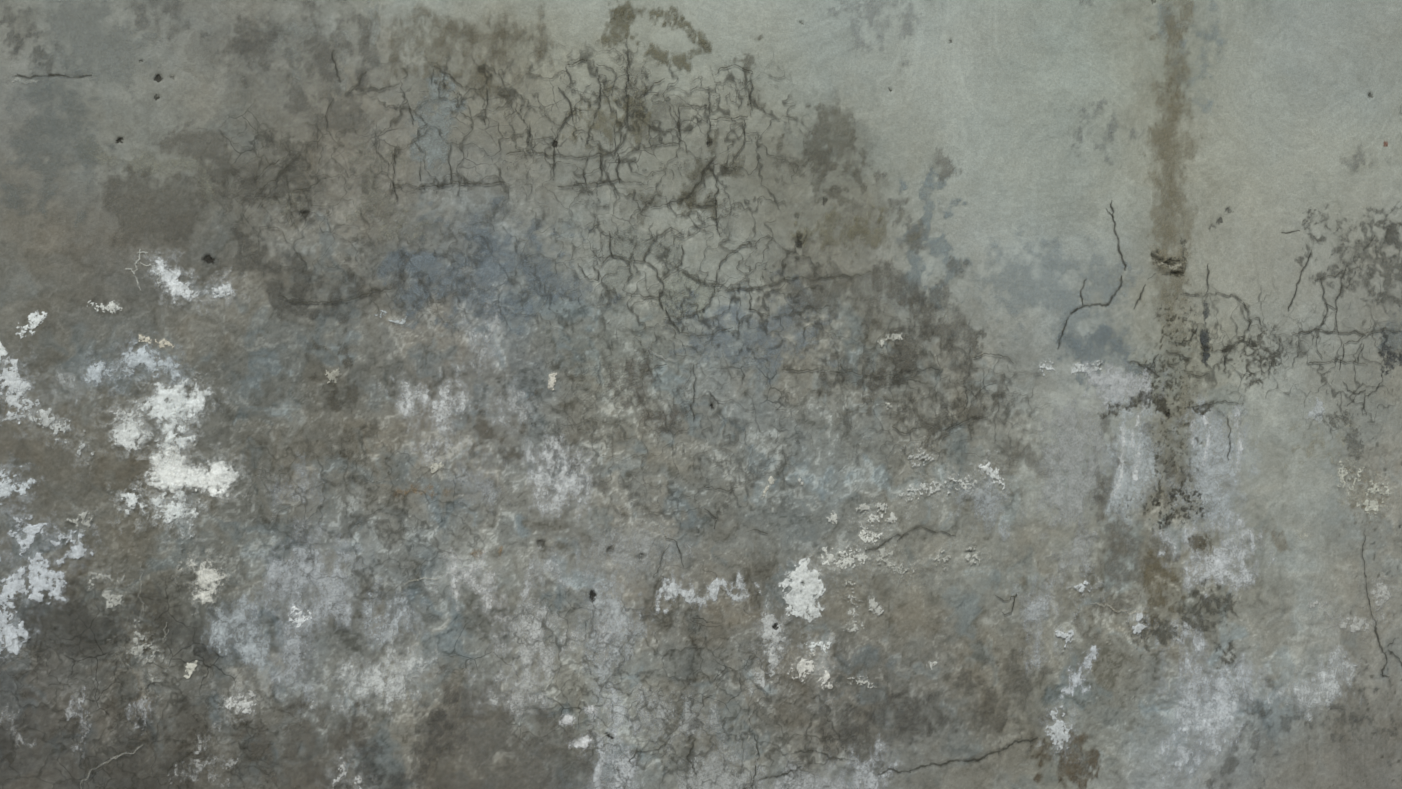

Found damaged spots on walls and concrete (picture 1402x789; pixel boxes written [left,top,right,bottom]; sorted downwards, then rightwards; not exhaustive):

crack [325,47,871,420]
crack [1059,202,1146,344]
spalling [1151,242,1187,277]
crack [1100,230,1401,460]
leakage [1026,259,1356,778]
leakage [1309,576,1394,632]